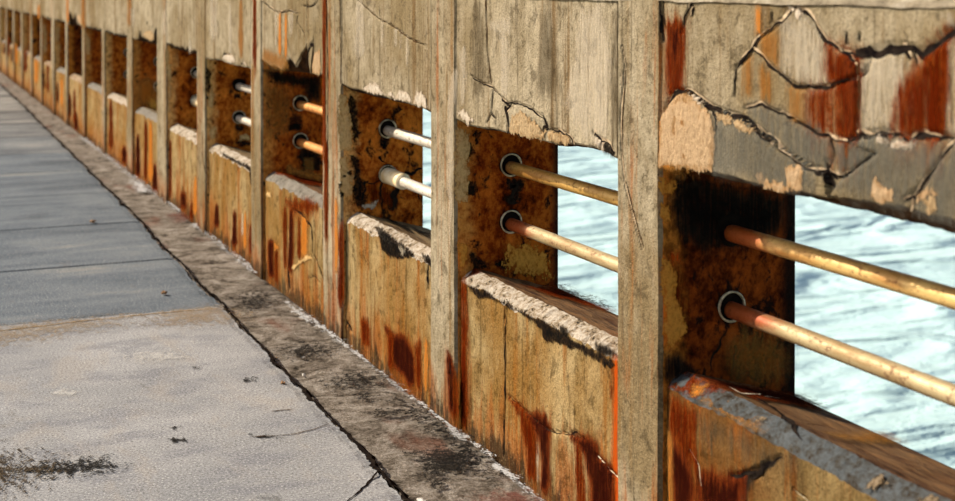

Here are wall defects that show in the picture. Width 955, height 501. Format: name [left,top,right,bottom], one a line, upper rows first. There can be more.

crack [659,1,694,41]
rust [267,0,345,307]
crack [362,156,422,209]
crack [471,35,643,245]
spalling [658,92,955,222]
crack [667,5,955,212]
rust [889,25,953,154]
crack [0,84,411,501]
peeling [659,252,690,349]
rust [508,397,552,495]
rust [570,357,618,501]
rust [662,372,826,501]